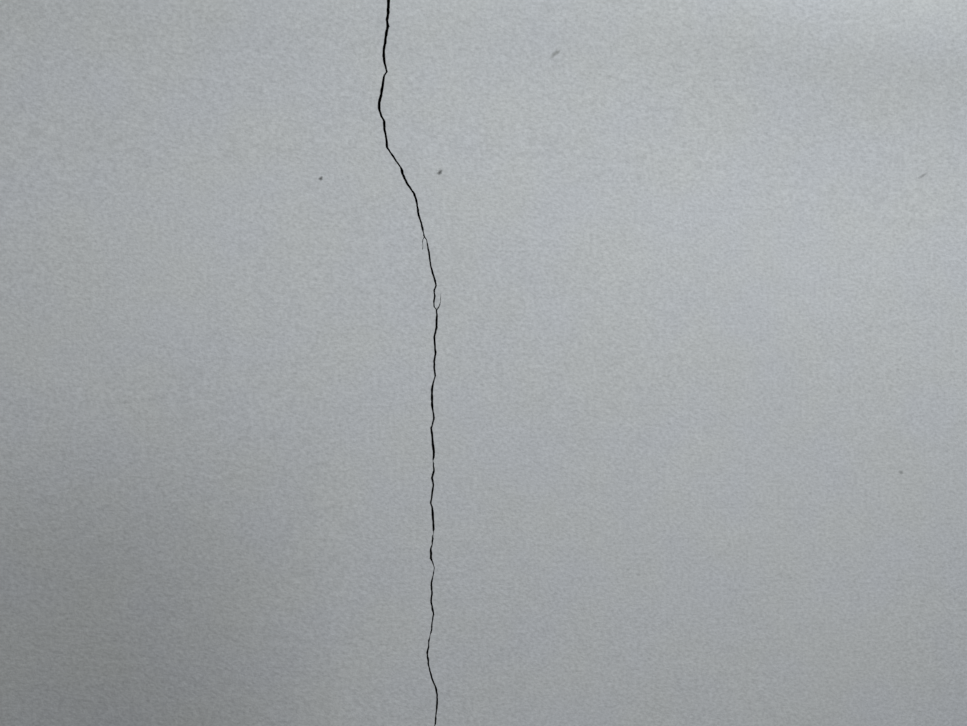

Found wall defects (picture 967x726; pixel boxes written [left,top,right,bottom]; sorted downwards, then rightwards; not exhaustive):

crack [378,0,441,726]